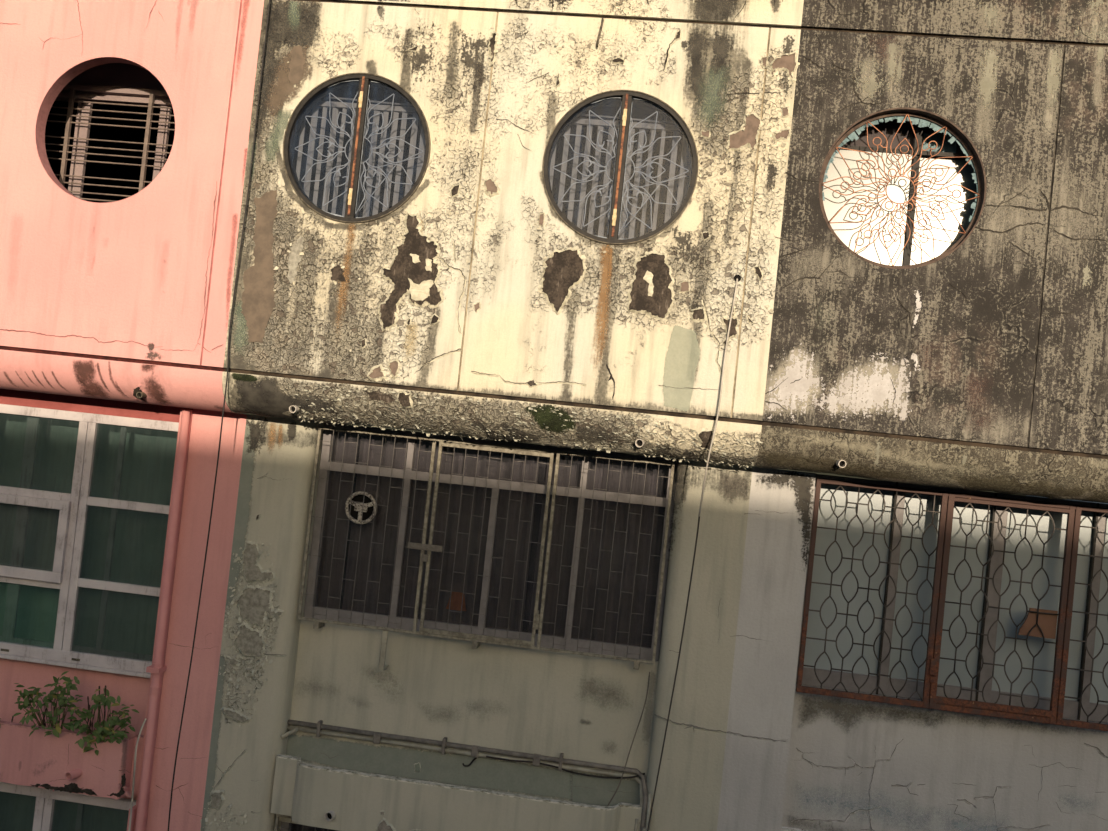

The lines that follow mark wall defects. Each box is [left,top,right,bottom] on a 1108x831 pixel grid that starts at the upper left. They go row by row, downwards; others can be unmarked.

crack [663,34,680,72]
rust [350,108,362,188]
rust [614,126,625,209]
damp [767,163,778,194]
crack [975,186,1106,257]
peeling [329,212,456,346]
peeling [533,238,587,315]
rust [596,226,615,362]
peeling [620,249,754,411]
efflorescence [913,290,922,328]
efflorescence [765,343,923,421]
crack [654,714,925,831]